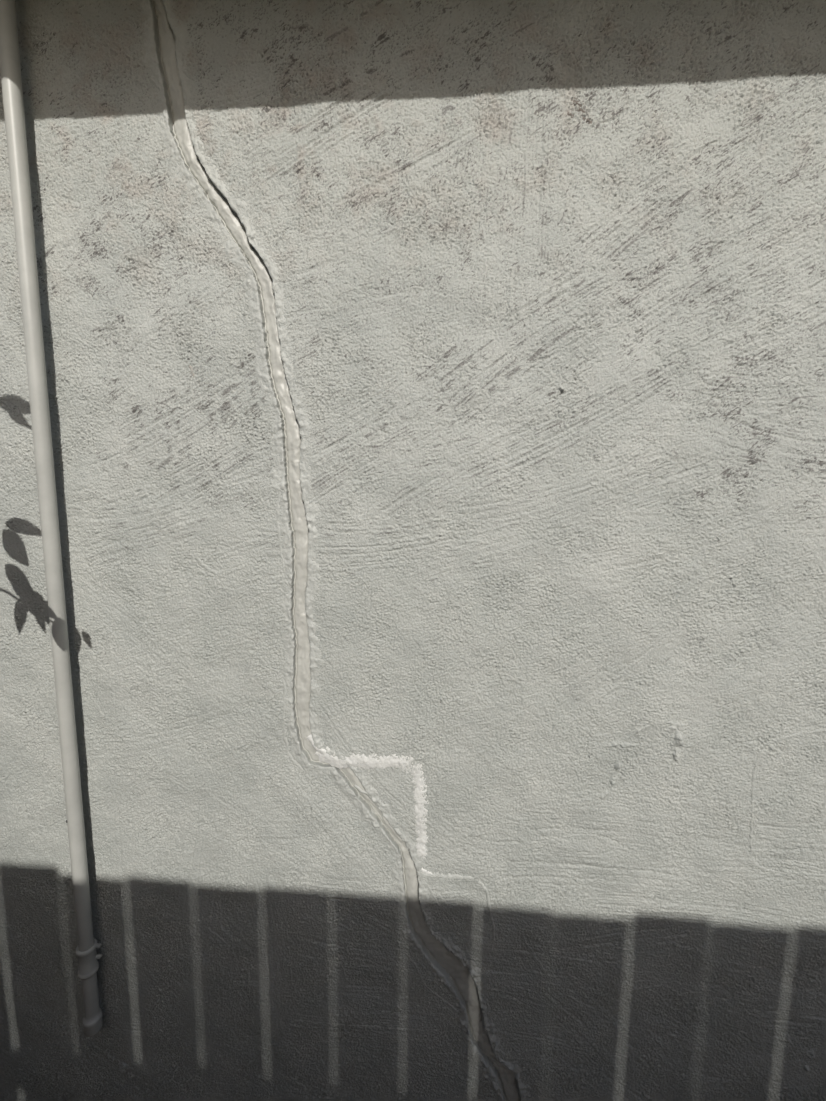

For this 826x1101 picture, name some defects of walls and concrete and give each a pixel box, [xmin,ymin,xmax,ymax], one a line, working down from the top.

crack [140,0,531,1101]